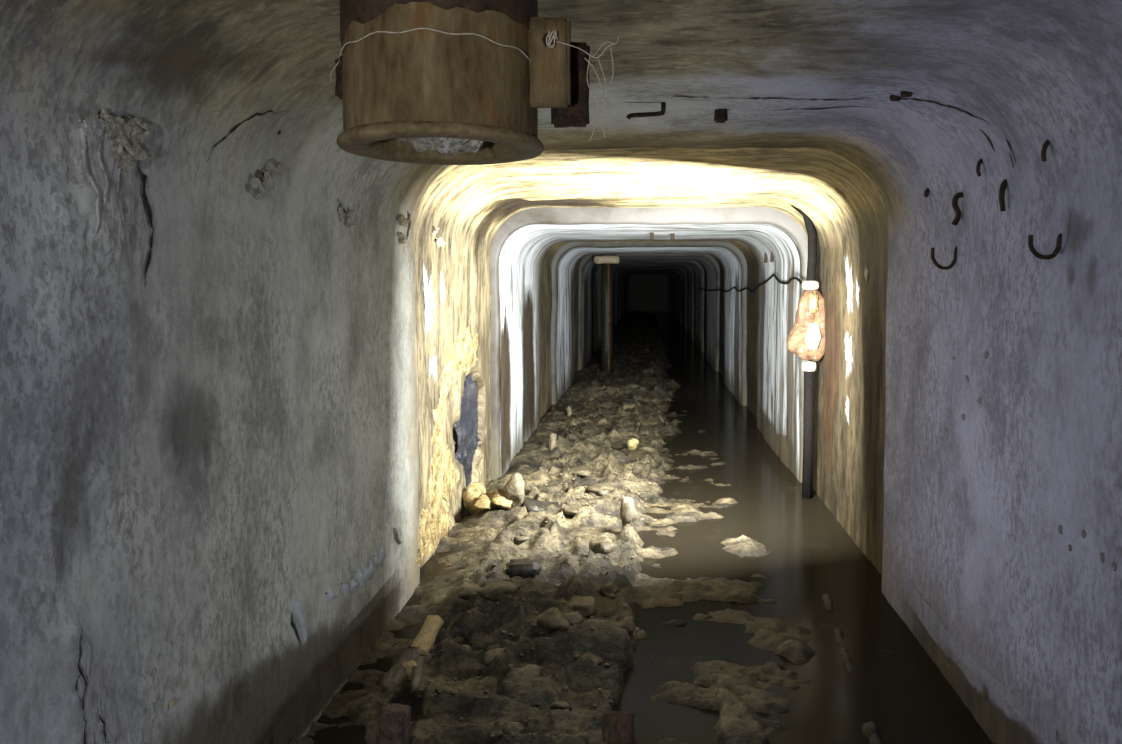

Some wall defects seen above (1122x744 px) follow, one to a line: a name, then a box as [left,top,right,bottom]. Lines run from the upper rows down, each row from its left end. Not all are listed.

crack [208,110,283,160]
peeling [423,272,444,329]
spalling [416,327,479,567]
crack [73,604,112,744]
water stain [165,581,399,744]
water stain [912,612,1035,744]